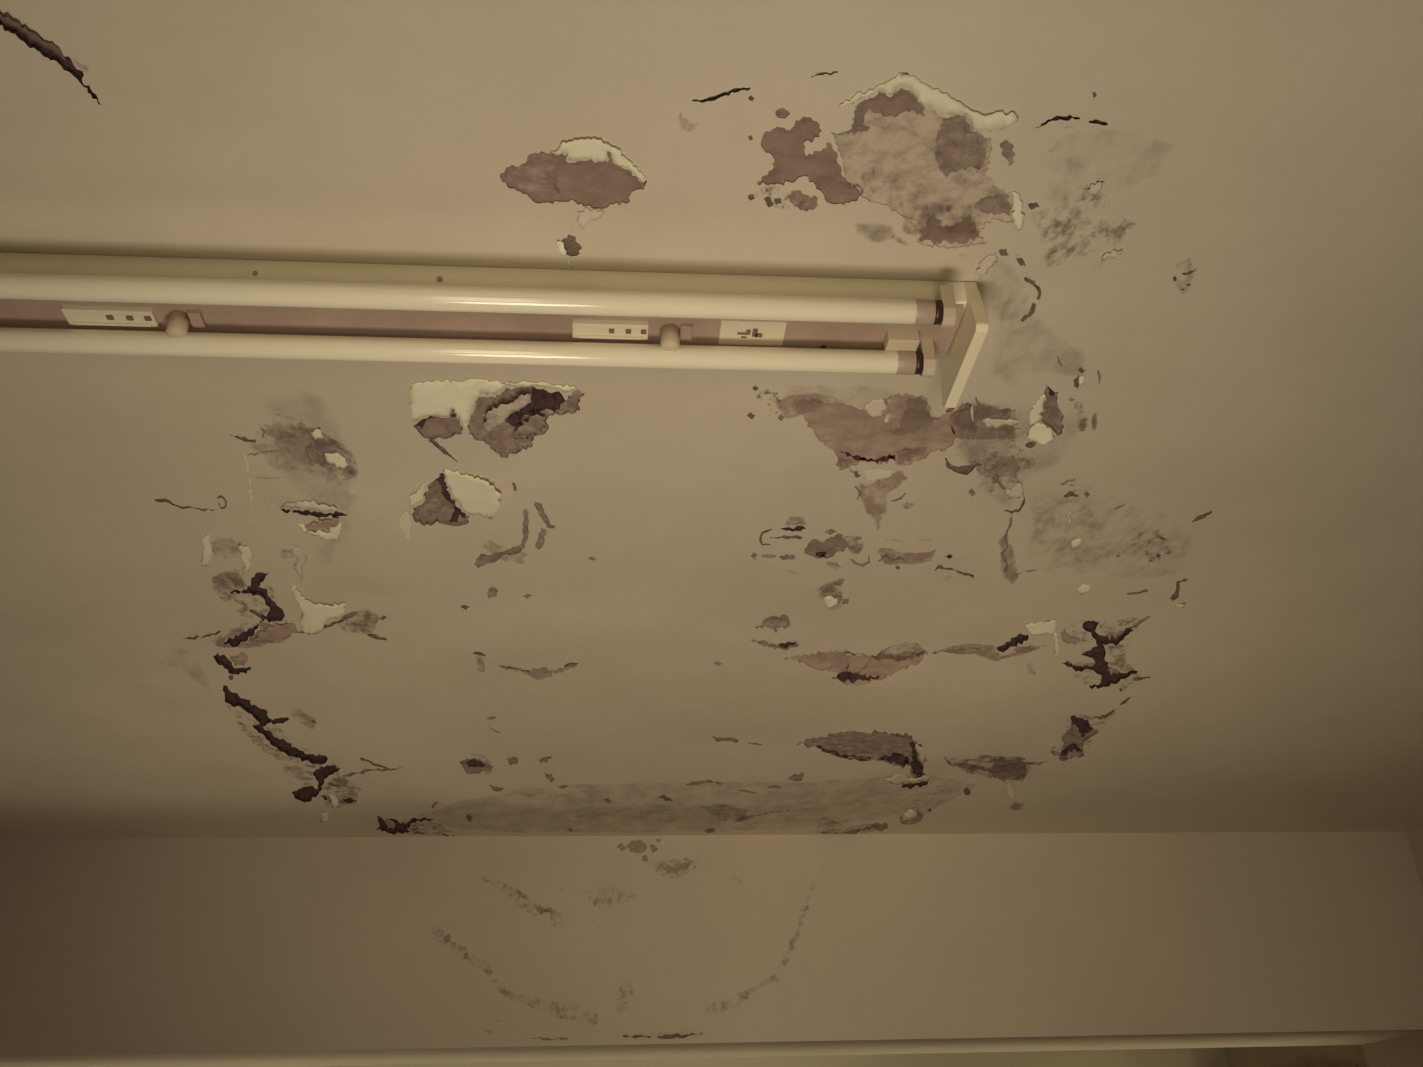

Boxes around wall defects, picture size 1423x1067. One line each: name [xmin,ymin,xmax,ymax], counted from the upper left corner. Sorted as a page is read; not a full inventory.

crack [0,13,101,105]
peeling [500,138,647,266]
peeling [748,73,1025,249]
peeling [230,413,354,524]
spalling [399,378,585,540]
peeling [747,356,1101,499]
peeling [201,535,253,588]
crack [183,572,454,837]
spalling [751,614,929,686]
spalling [797,730,931,825]
peeling [944,697,1130,809]
crack [932,579,1187,692]